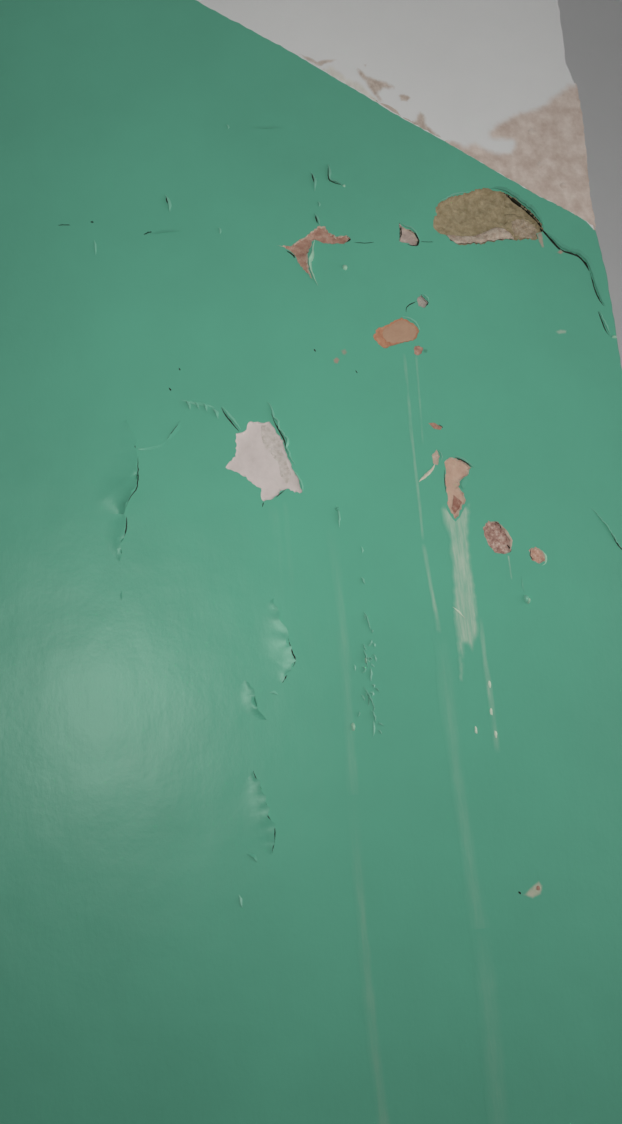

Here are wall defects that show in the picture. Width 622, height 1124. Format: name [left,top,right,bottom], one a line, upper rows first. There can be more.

peeling [295,52,596,248]
peeling [278,202,351,285]
flaking render [373,294,429,355]
crack [540,228,617,338]
peeling [222,404,303,507]
peeling [432,450,474,519]
peeling [483,521,513,580]
peeling [529,547,547,565]
water stain [402,352,511,1124]